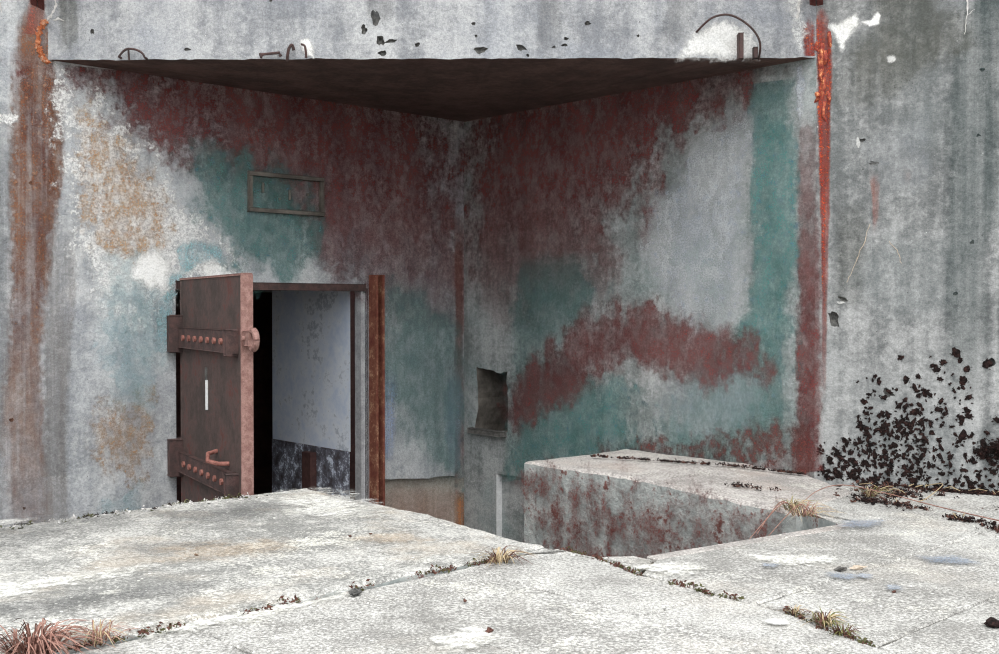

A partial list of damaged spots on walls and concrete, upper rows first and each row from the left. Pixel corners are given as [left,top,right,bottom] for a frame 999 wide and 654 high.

rust [4,1,63,463]
spalling [361,10,397,56]
rust [804,18,832,321]